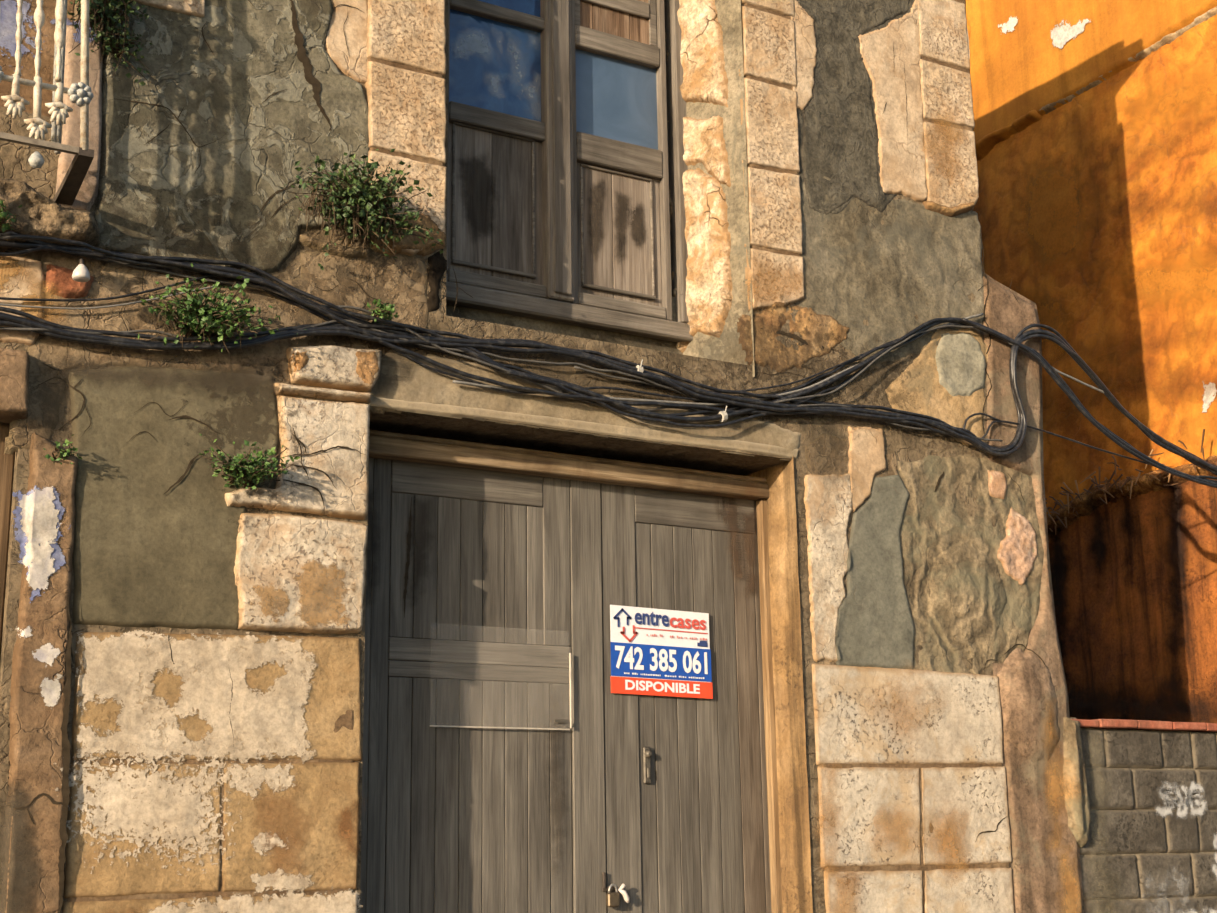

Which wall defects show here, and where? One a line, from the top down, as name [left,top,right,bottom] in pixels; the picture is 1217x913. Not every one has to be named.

peeling [998,17,1018,34]
peeling [1050,18,1091,49]
spalling [797,0,910,215]
water stain [463,159,494,233]
water stain [589,181,645,257]
crack [126,402,185,443]
peeling [12,486,71,603]
peeling [836,475,914,670]
water stain [1048,476,1215,723]
peeling [15,552,355,885]
peeling [148,867,363,913]